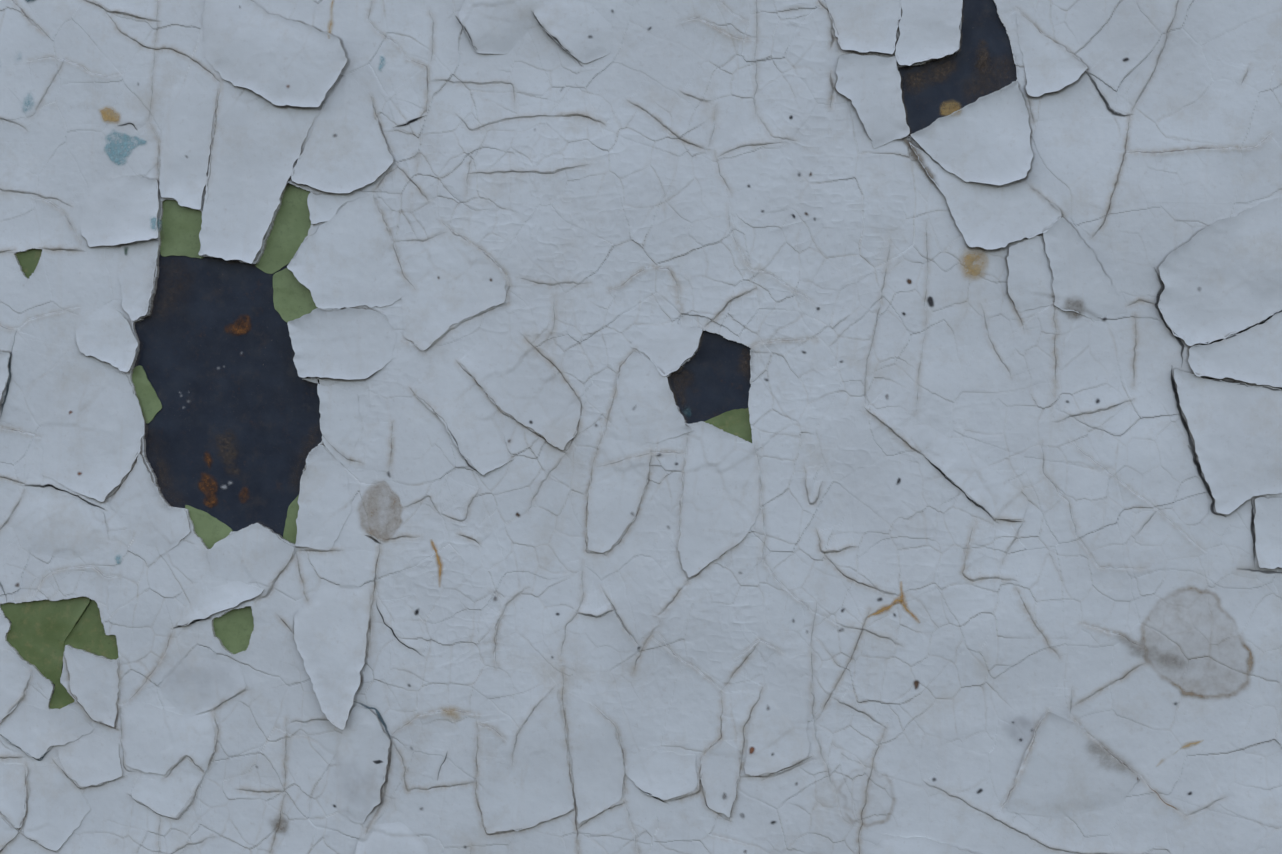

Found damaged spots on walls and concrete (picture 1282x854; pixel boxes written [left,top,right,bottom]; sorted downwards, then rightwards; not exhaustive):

peeling [825,0,1127,319]
crack [1096,87,1114,113]
crack [39,484,101,508]
peeling [41,0,507,654]
peeling [412,339,581,475]
peeling [587,321,760,577]
crack [929,461,987,512]
crack [1155,282,1282,515]
peeling [1158,196,1282,569]
crack [1251,506,1282,573]
peeling [0,597,215,851]
crack [361,704,389,764]